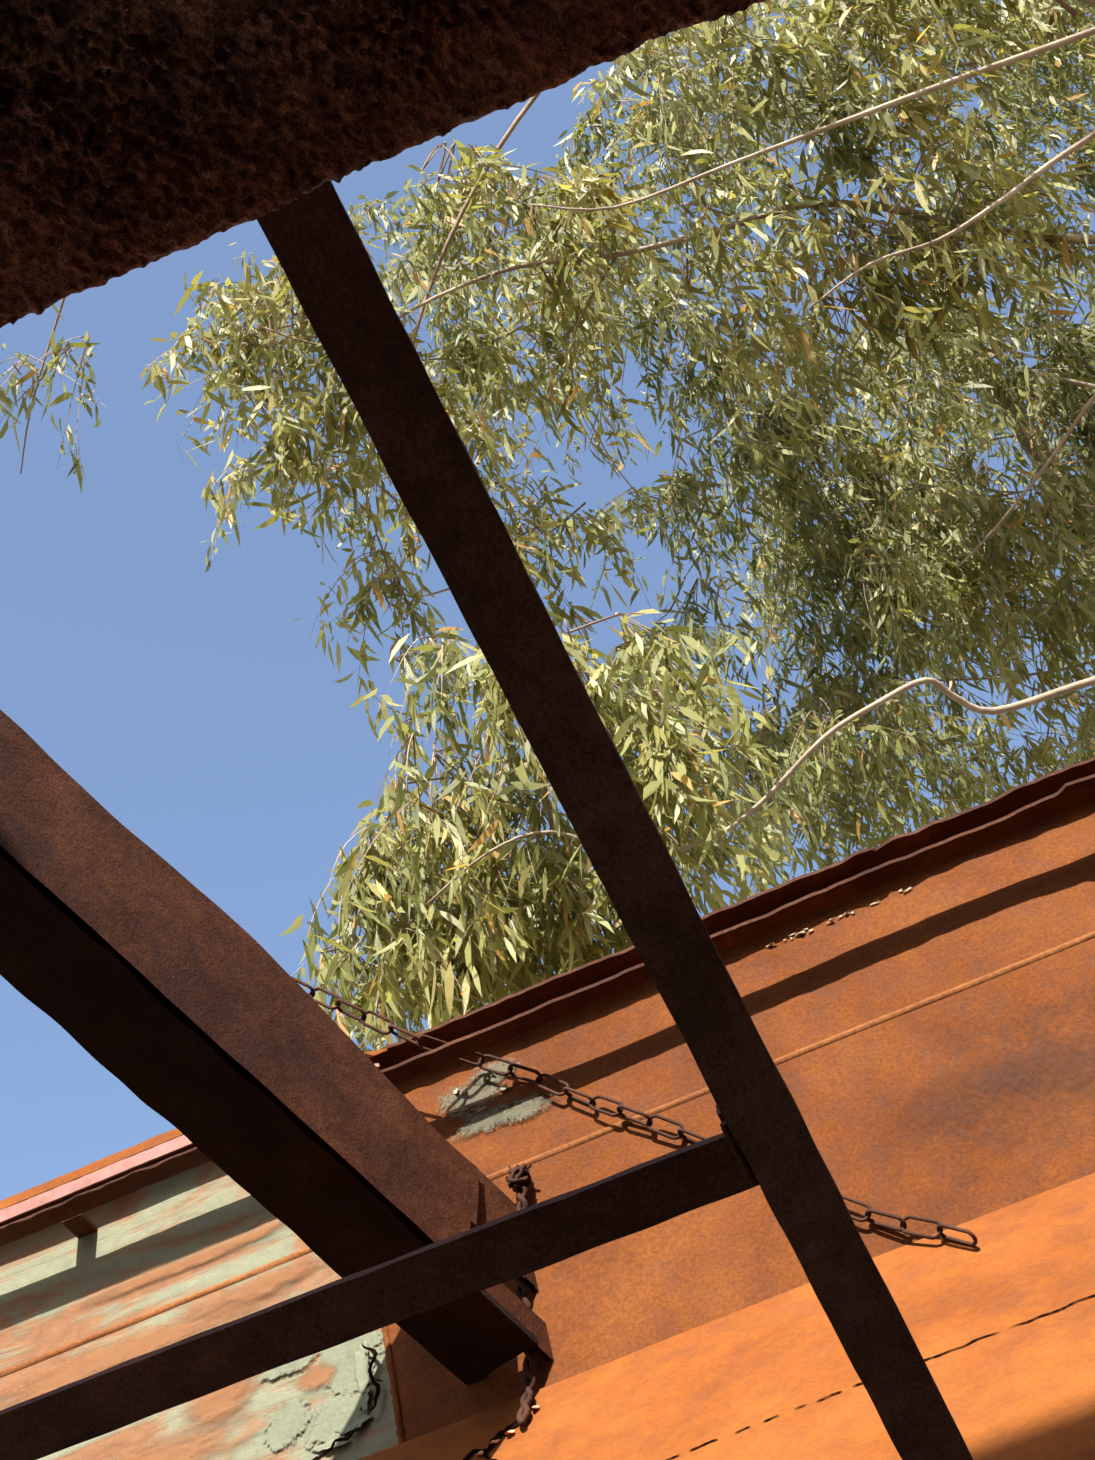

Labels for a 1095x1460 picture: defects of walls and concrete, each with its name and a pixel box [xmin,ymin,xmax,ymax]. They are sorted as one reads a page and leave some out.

corrosion [90,1220,281,1299]
corrosion [0,1262,312,1410]
corrosion [110,1381,251,1460]
corrosion [300,1365,334,1389]
peeling [258,1331,385,1452]